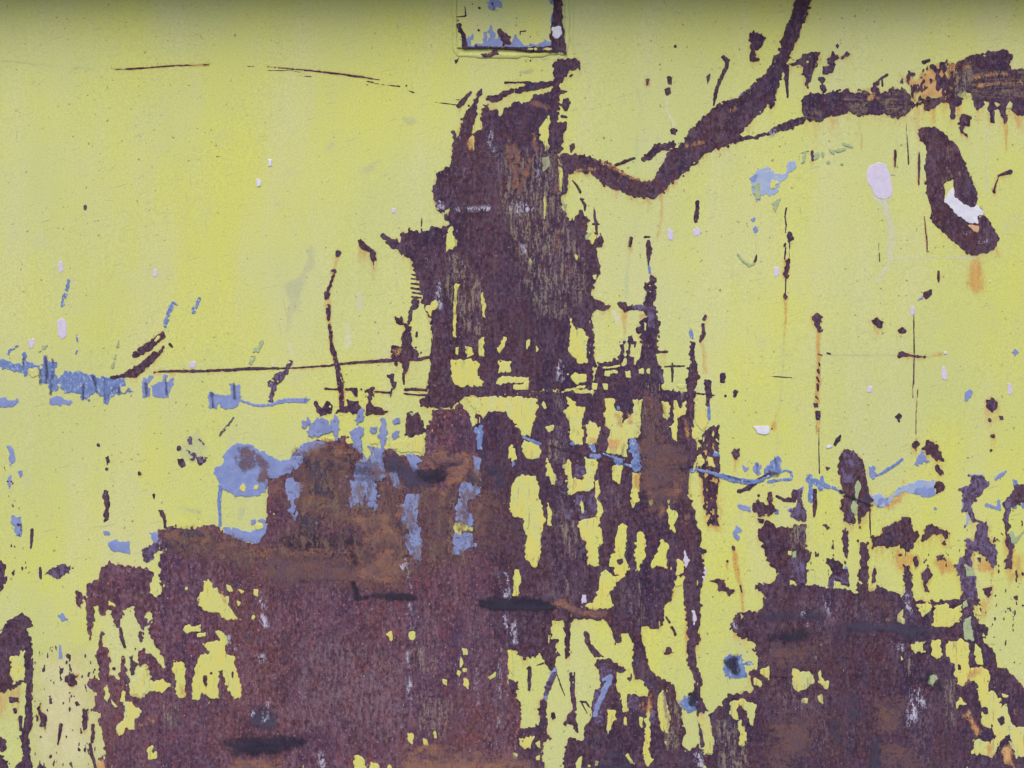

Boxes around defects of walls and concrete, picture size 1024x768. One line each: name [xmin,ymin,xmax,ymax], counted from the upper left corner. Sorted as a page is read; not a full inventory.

rust [747,30,766,68]
rust [314,250,397,418]
peeling [0,352,174,406]
peeling [208,383,310,410]
peeling [10,515,22,537]
peeling [46,564,73,579]
peeling [103,531,166,563]
peeling [213,408,423,563]
rust [837,449,874,558]
rust [910,438,946,494]
rust [921,523,952,549]
rust [1002,479,1024,600]